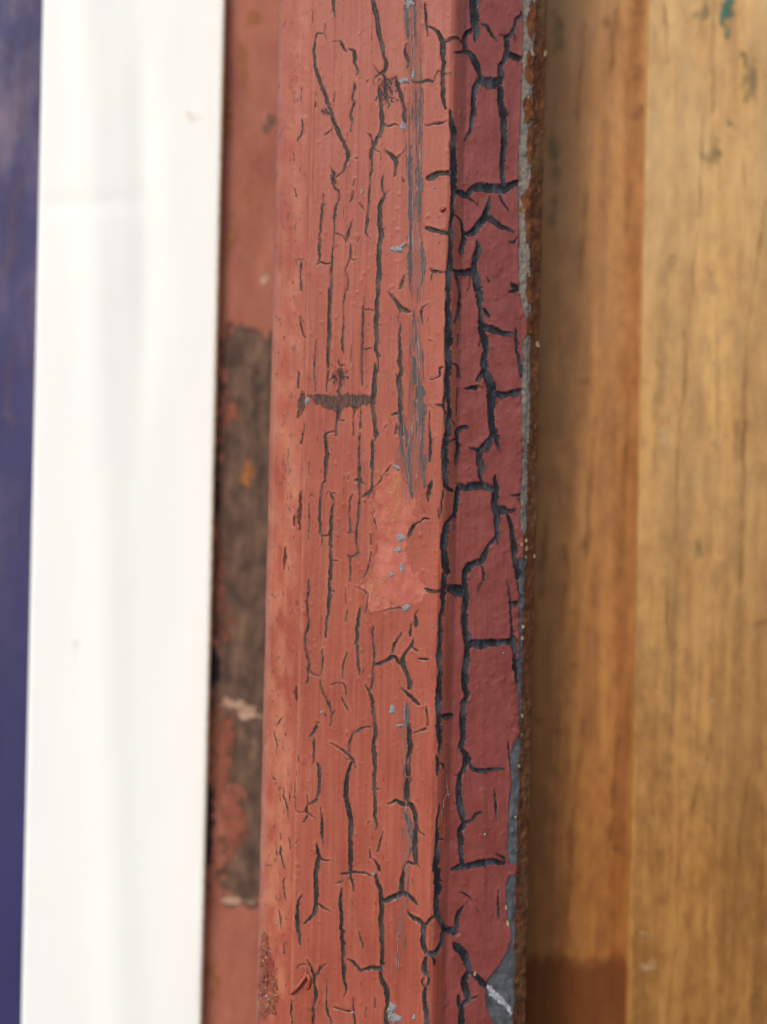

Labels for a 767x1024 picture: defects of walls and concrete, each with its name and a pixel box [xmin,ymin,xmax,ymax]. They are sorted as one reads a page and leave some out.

peeling [360,463,430,612]
crack [272,0,524,1024]
peeling [485,557,526,1024]